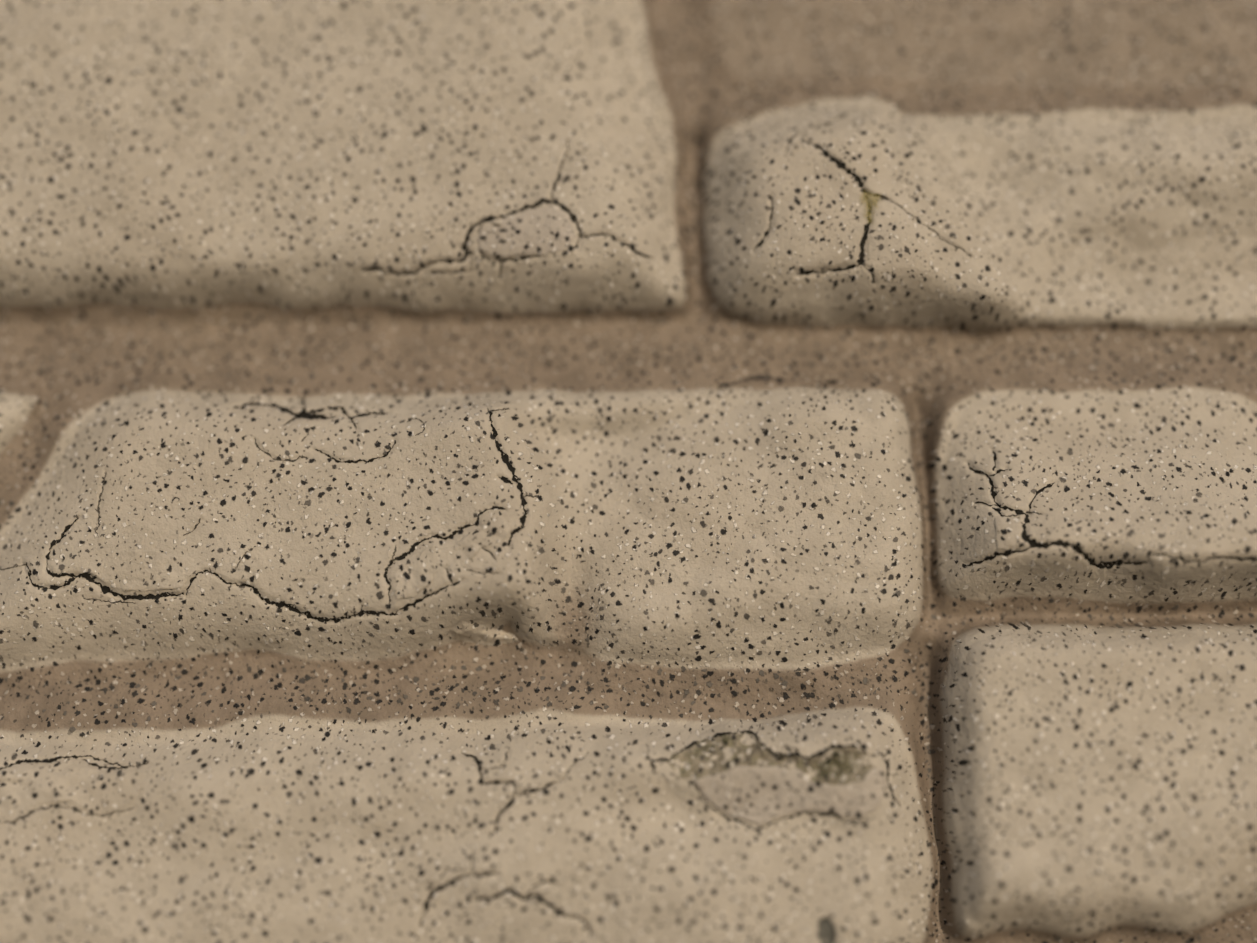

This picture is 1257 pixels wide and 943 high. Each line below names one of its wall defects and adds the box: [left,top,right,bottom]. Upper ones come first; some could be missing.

crack [362,143,655,279]
crack [753,194,773,252]
crack [785,112,971,283]
crack [0,398,539,623]
crack [965,451,1257,569]
crack [420,751,592,937]
spalling [647,724,886,831]